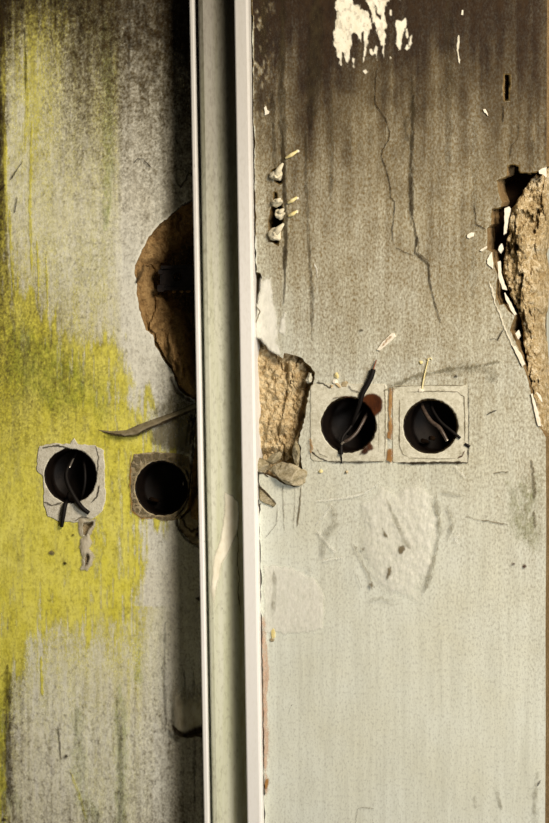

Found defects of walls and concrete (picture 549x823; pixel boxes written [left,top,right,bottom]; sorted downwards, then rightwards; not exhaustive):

peeling [0,6,199,823]
spalling [274,204,284,243]
water stain [272,0,288,286]
flaking render [256,279,357,507]
peeling [333,0,412,74]
rust [363,389,393,439]
crack [375,63,441,323]
flaking render [479,167,549,433]